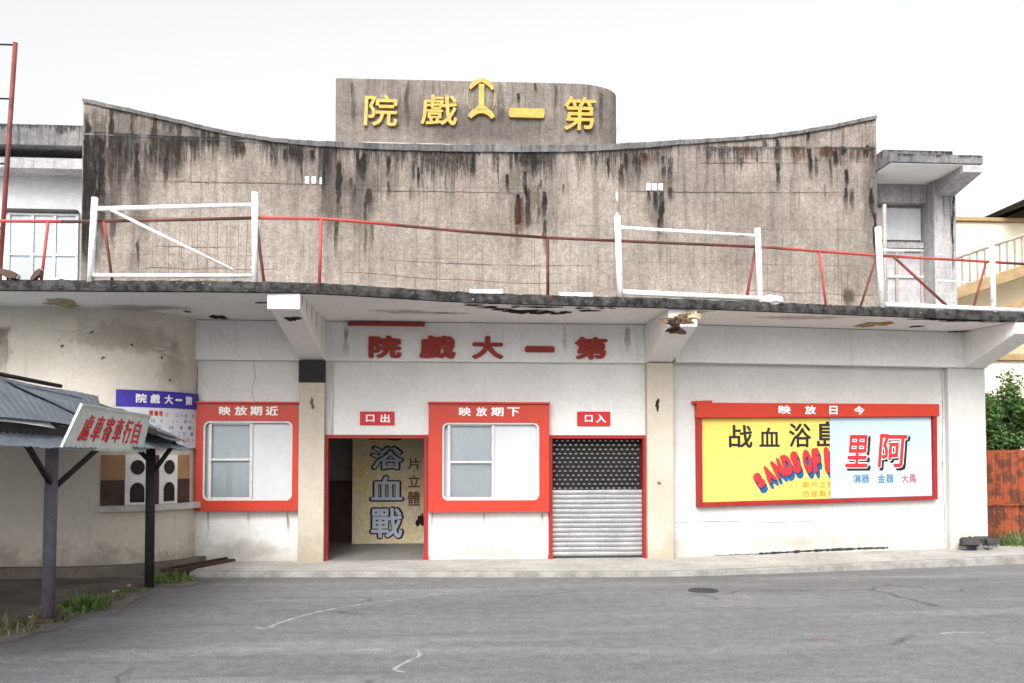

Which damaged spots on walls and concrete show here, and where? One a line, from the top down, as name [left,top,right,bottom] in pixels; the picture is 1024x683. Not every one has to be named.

leakage [0,110,480,252]
leakage [493,152,554,236]
leakage [575,147,673,215]
leakage [647,188,672,228]
leakage [698,132,876,201]
peeling [466,305,615,315]